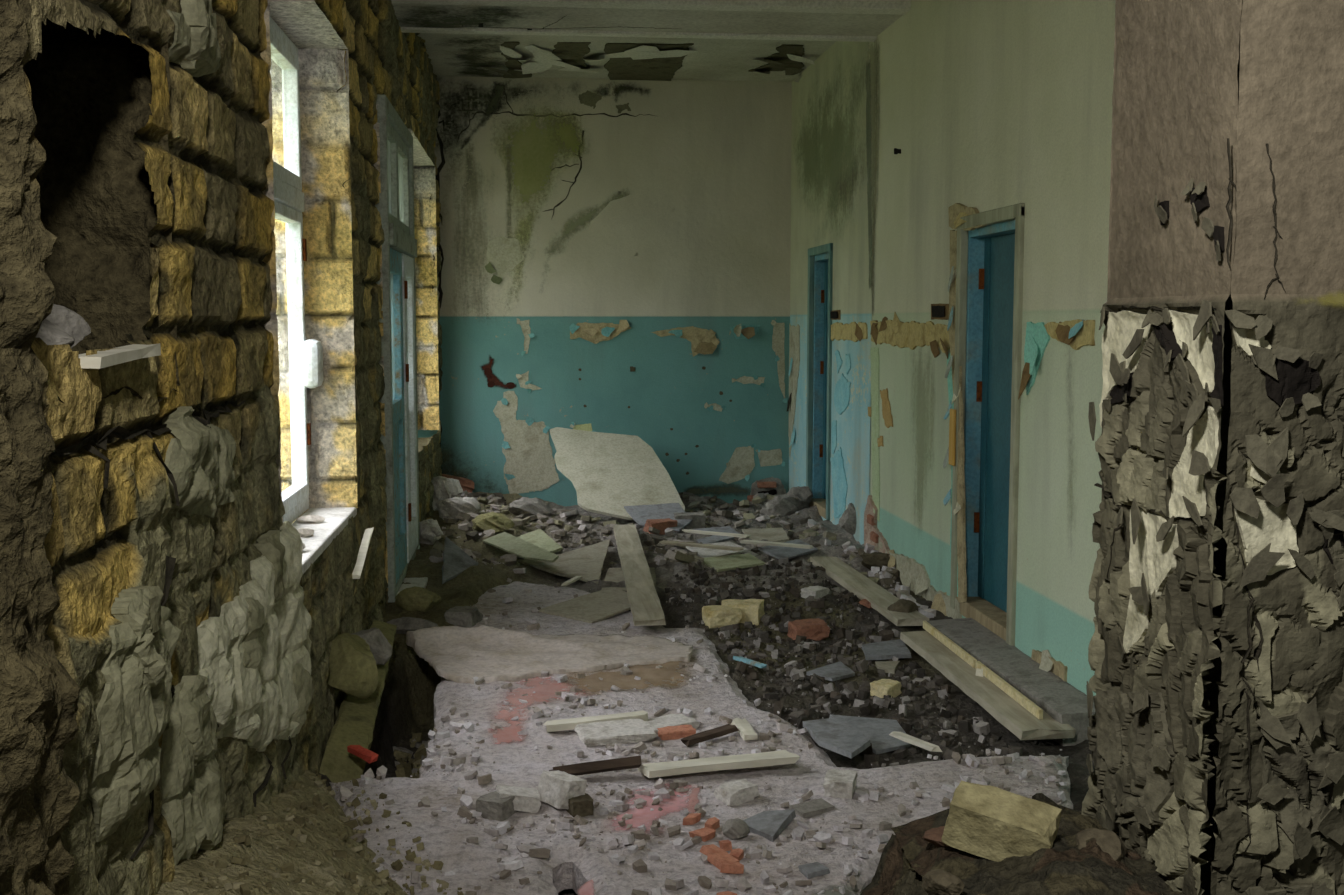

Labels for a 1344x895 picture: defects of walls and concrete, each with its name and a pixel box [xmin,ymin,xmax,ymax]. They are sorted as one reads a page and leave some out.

leakage [399,7,538,305]
leakage [501,111,583,204]
crack [435,84,655,308]
peeling [481,29,698,81]
leakage [595,84,649,102]
crack [1226,138,1236,270]
crack [1264,143,1286,299]
peeling [493,371,560,494]
peeling [652,320,800,501]
spalling [830,203,986,619]
peeling [1018,299,1344,660]
flaking render [87,521,314,866]